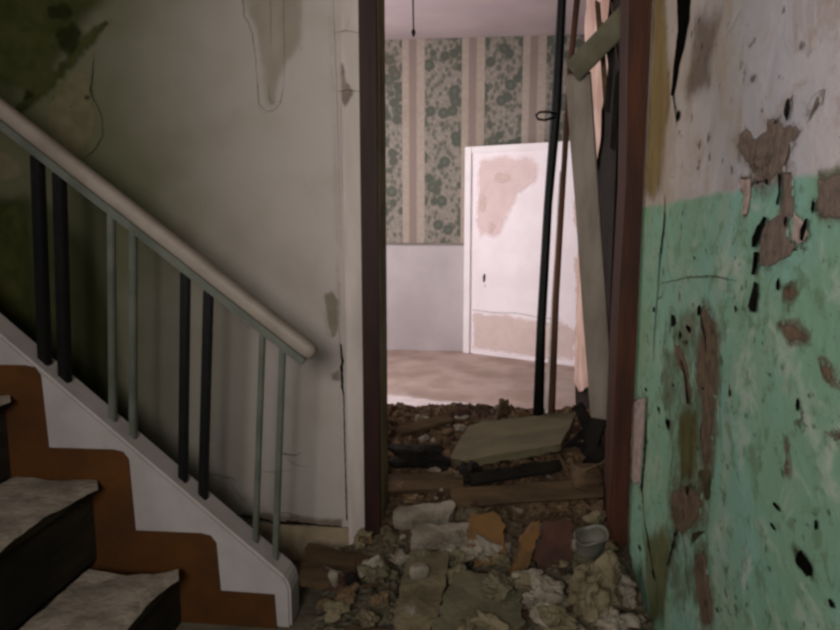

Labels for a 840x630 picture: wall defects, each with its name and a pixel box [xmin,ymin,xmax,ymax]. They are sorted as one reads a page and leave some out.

water stain [0,0,109,114]
peeling [804,89,824,121]
peeling [478,159,535,234]
peeling [737,98,840,312]
peeling [474,310,575,358]
peeling [777,320,810,345]
peeling [671,303,720,474]
crack [236,344,347,527]
peeling [667,484,703,566]
peeling [695,548,718,624]